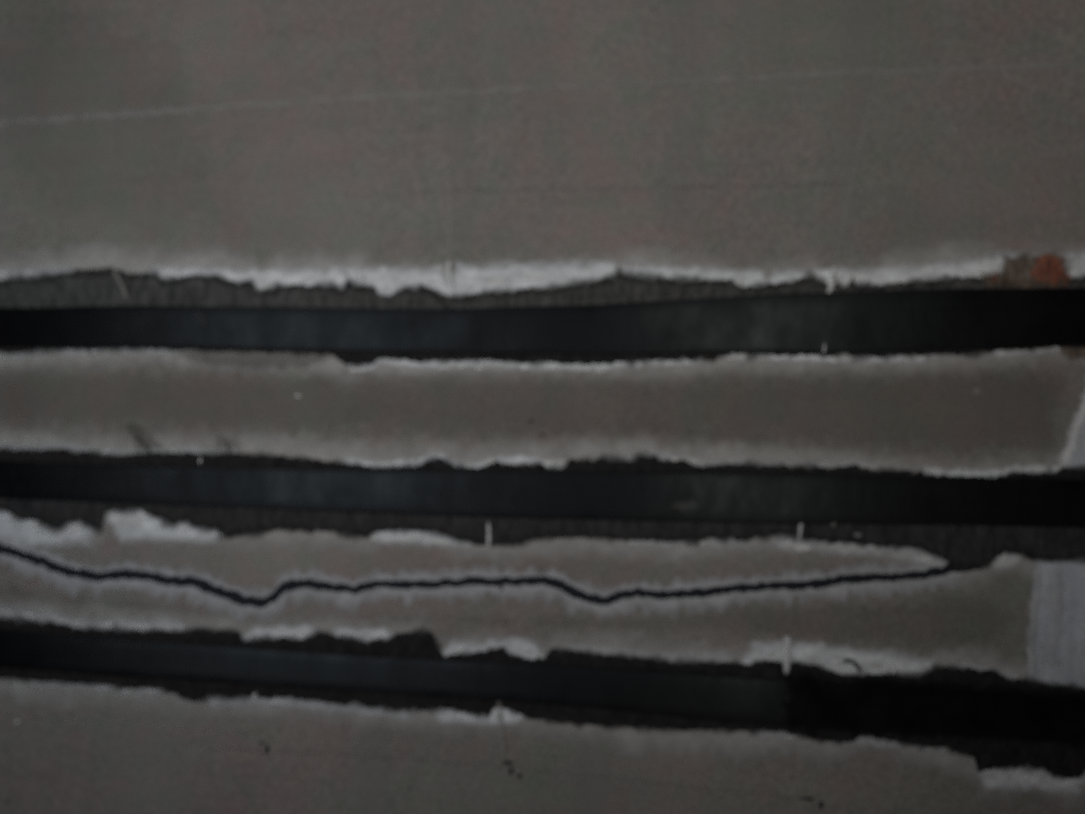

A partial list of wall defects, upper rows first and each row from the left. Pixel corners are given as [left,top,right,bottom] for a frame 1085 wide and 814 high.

spalling [150,253,1028,297]
rust [983,254,1068,288]
spalling [349,357,704,373]
spalling [341,453,566,469]
spalling [0,509,94,547]
spalling [108,509,224,542]
spalling [370,529,471,545]
spalling [627,533,949,568]
crack [0,538,984,617]
spalling [442,638,544,660]
spalling [563,635,934,677]
spalling [979,765,1085,793]